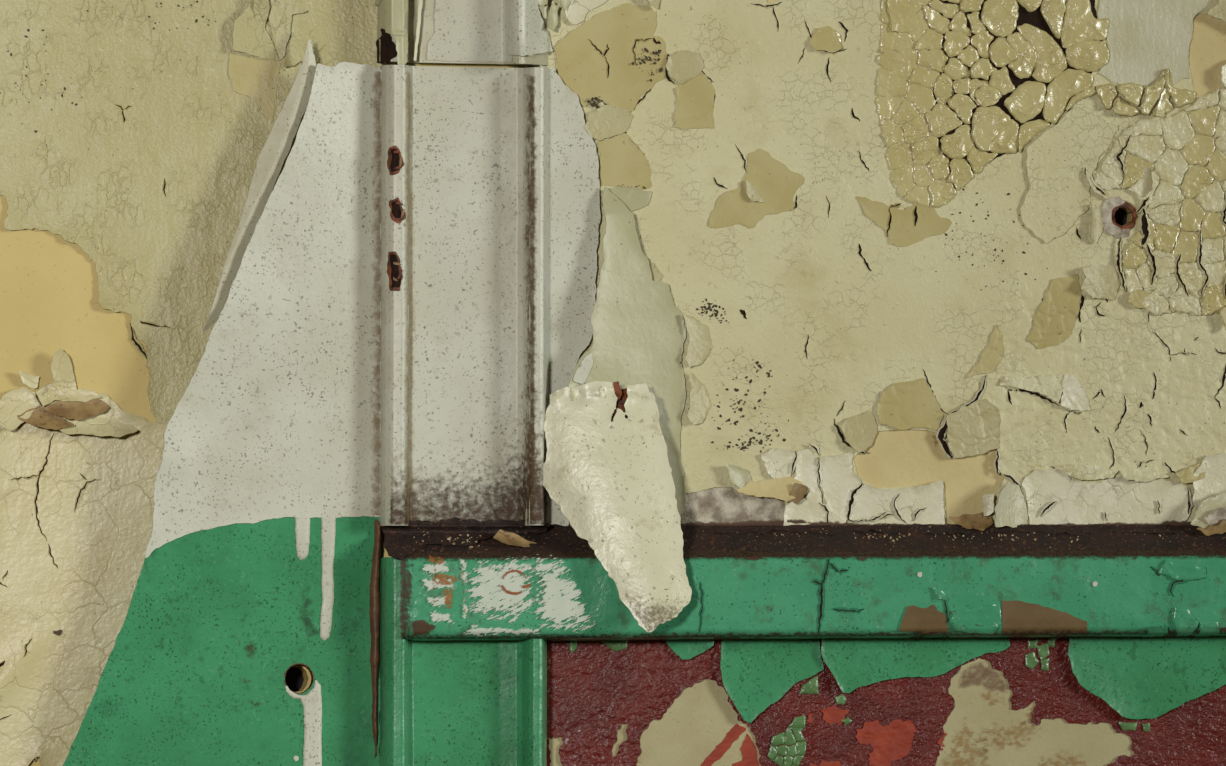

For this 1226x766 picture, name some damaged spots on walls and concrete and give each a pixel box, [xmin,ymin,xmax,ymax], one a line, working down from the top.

peeling [427,0,1226,632]
crack [923,135,1226,514]
peeling [0,0,423,766]
crack [10,433,58,568]
crack [74,473,99,512]
crack [1040,501,1056,517]
crack [0,570,9,587]
crack [813,559,864,634]
crack [1151,566,1199,596]
crack [0,638,33,668]
peeling [612,587,1226,766]
peeling [549,737,563,766]